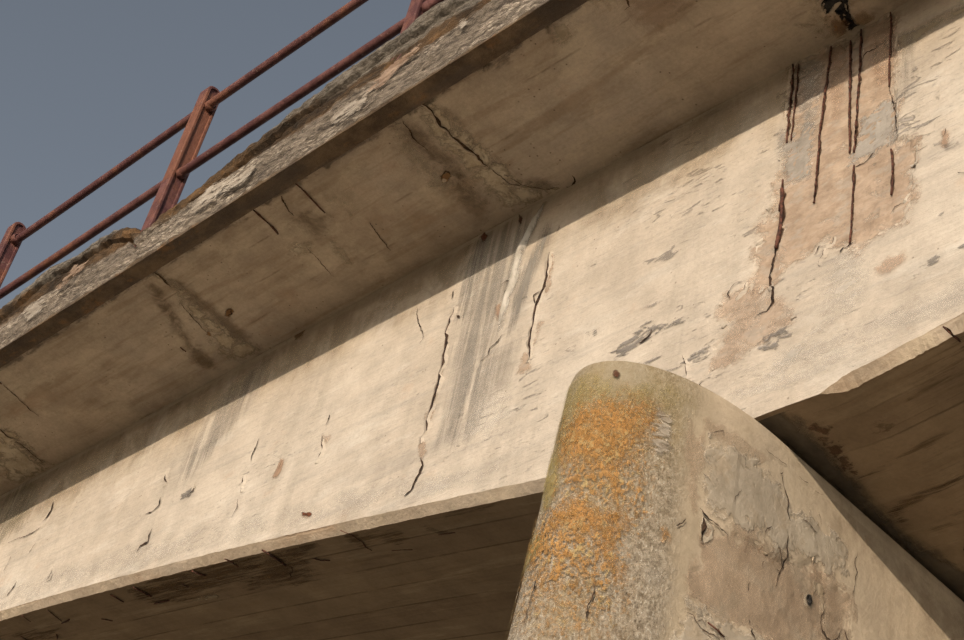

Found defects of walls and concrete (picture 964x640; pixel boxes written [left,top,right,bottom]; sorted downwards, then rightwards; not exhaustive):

crack [421,104,576,190]
spalling [751,0,922,319]
leakage [421,101,559,419]
crack [518,230,558,372]
crack [405,292,460,496]
leakage [130,544,315,603]
flaking render [670,605,762,640]
flaking render [700,436,849,576]